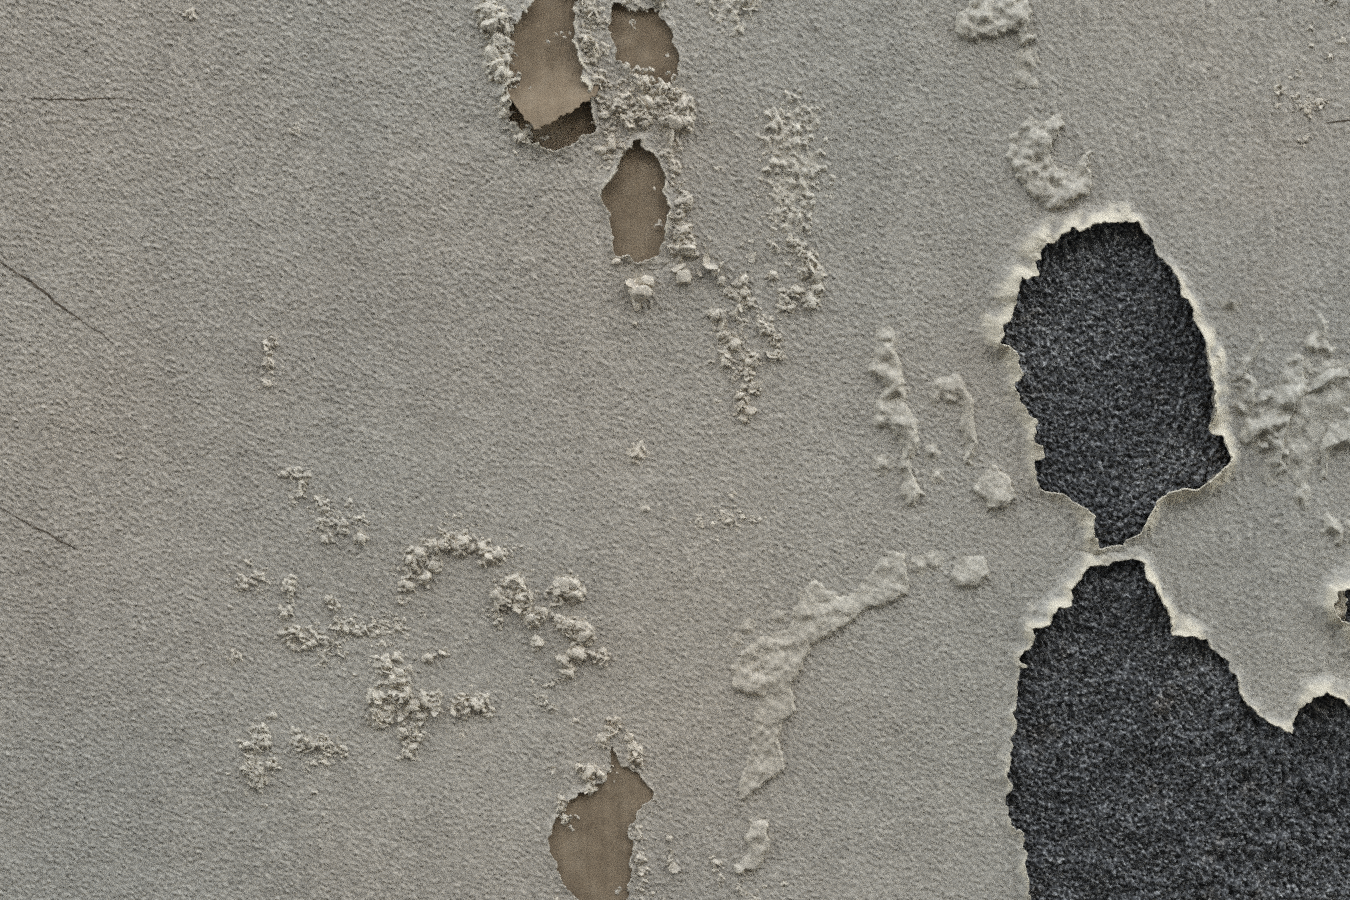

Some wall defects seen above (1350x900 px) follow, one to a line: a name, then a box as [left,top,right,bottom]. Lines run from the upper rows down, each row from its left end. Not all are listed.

peeling [472,0,725,326]
spalling [1000,221,1350,900]
peeling [541,716,666,900]
peeling [666,835,681,873]